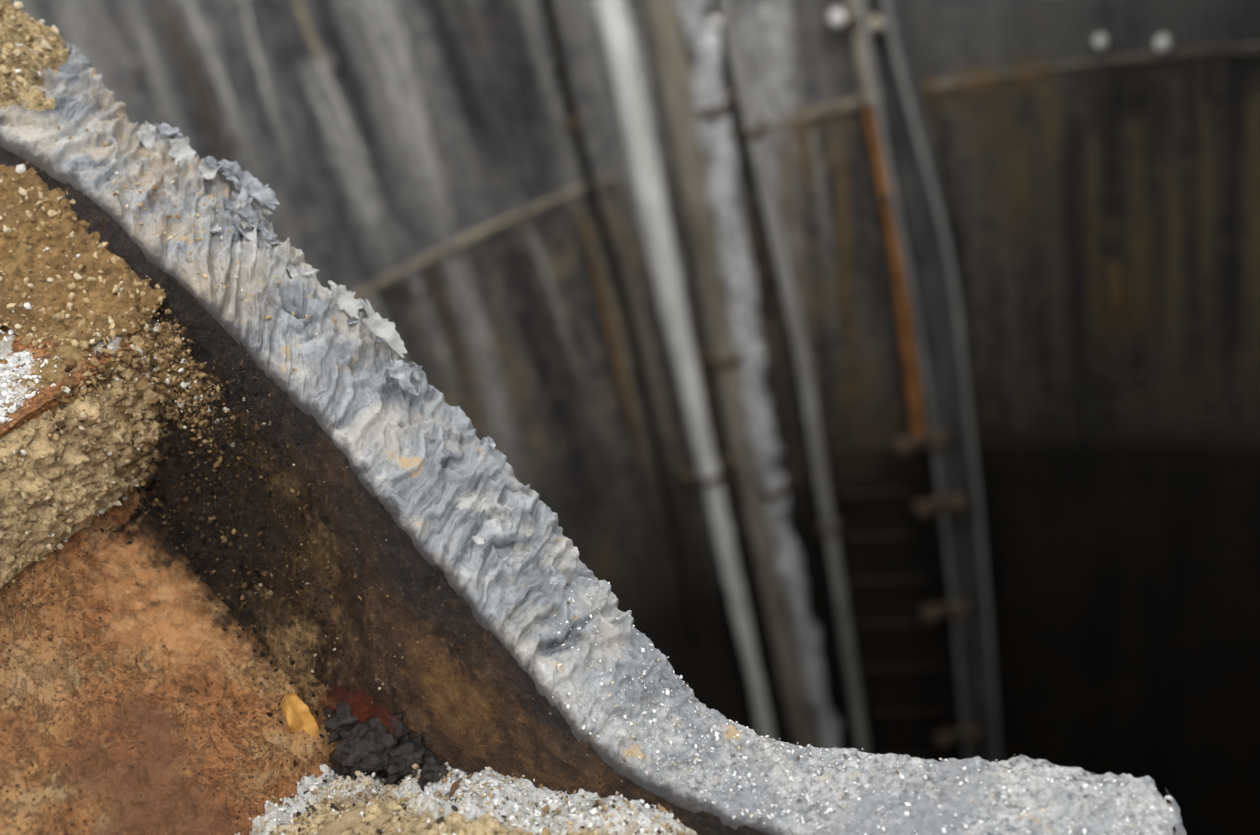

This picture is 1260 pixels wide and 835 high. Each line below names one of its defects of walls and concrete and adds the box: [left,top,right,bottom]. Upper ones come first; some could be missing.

corrosion [104,535,211,662]